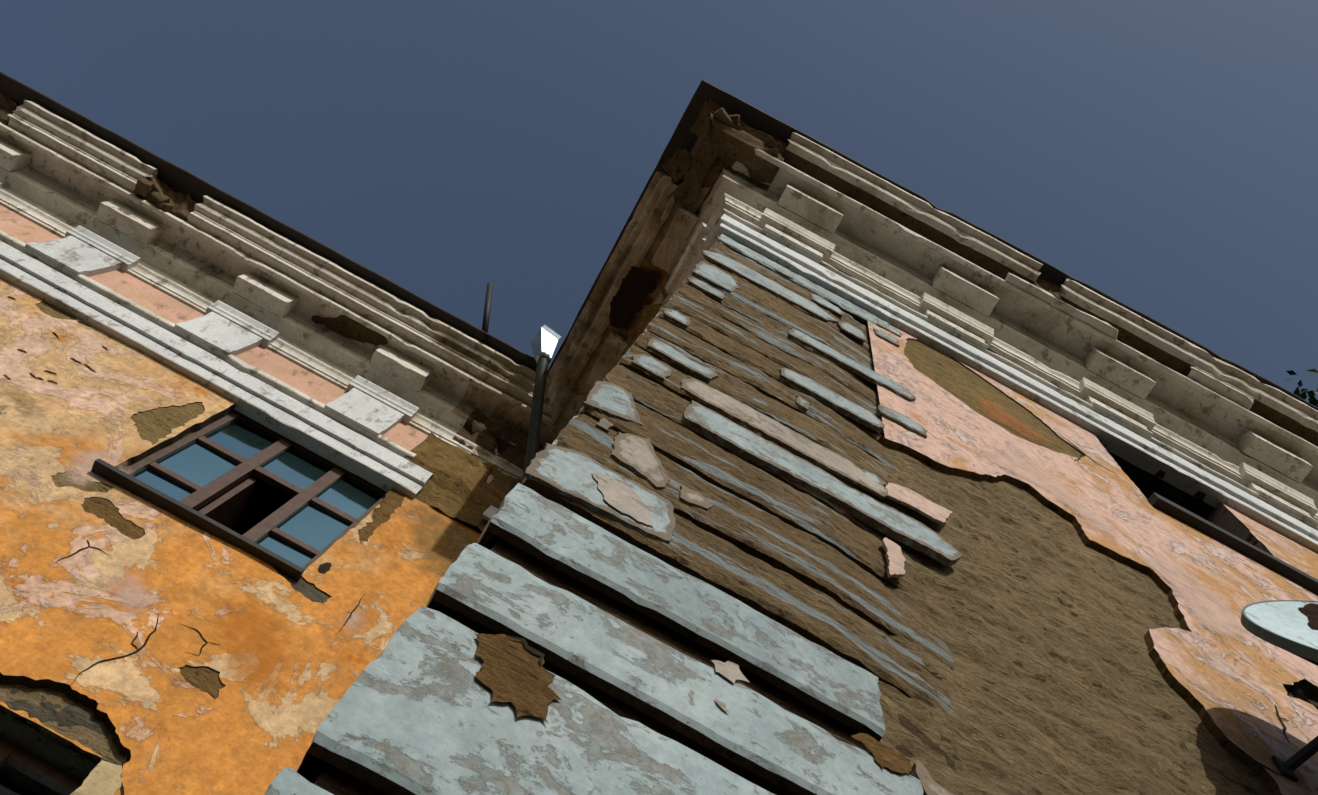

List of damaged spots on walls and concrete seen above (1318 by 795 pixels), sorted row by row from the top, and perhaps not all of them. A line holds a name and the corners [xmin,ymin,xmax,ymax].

spalling [311,315,388,345]
spalling [131,403,205,445]
spalling [52,471,145,540]
spalling [358,236,1272,795]
crack [55,540,108,563]
crack [336,594,365,635]
crack [74,614,220,681]
spalling [180,666,225,700]
spalling [4,686,109,740]